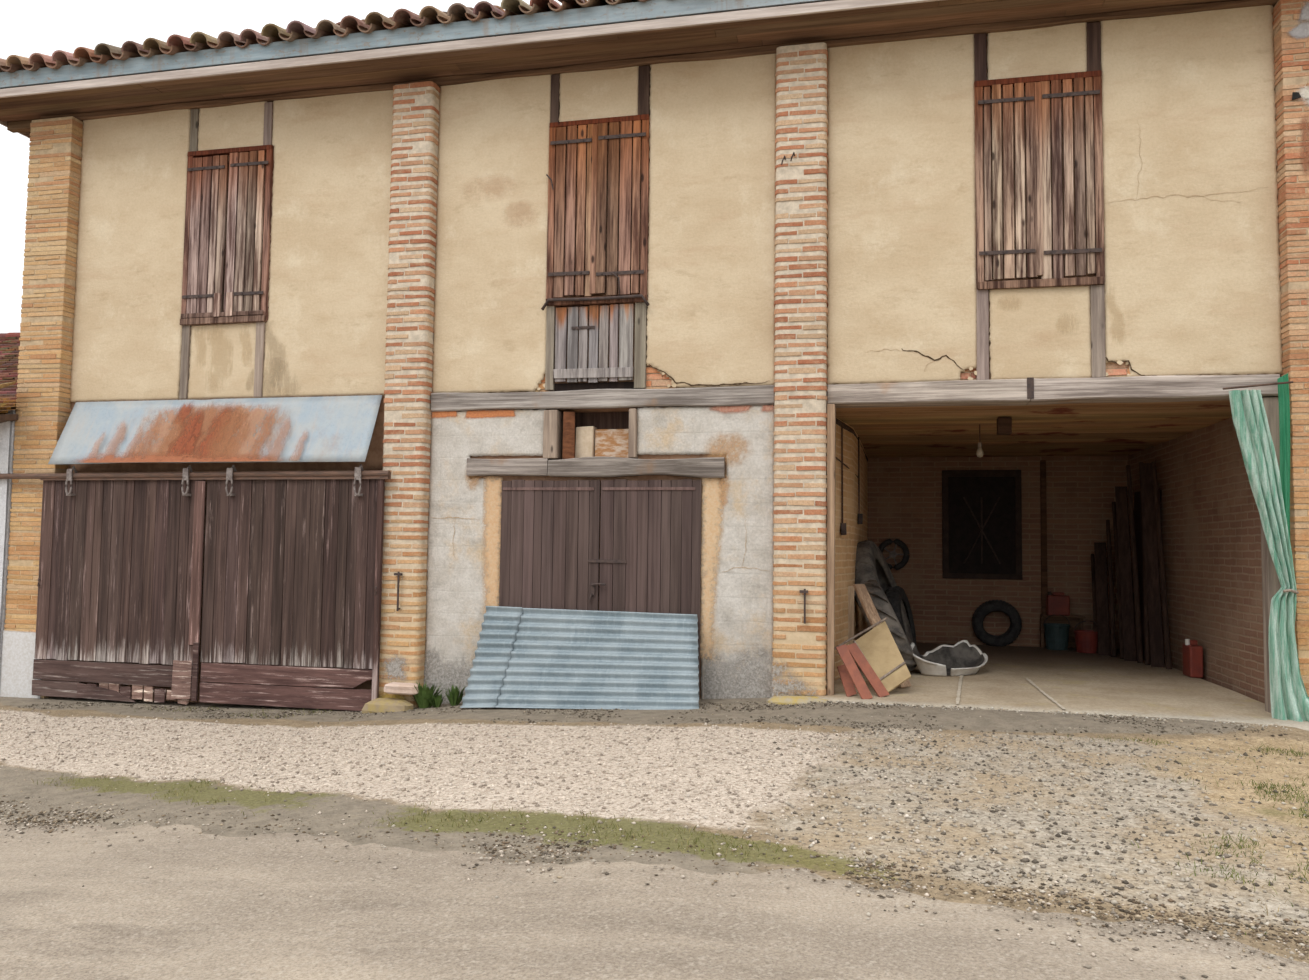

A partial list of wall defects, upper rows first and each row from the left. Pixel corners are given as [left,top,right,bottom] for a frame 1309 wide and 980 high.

crack [1105,120,1266,204]
spalling [646,365,677,389]
crack [867,349,963,371]
spalling [1106,360,1130,377]
rust [81,404,281,463]